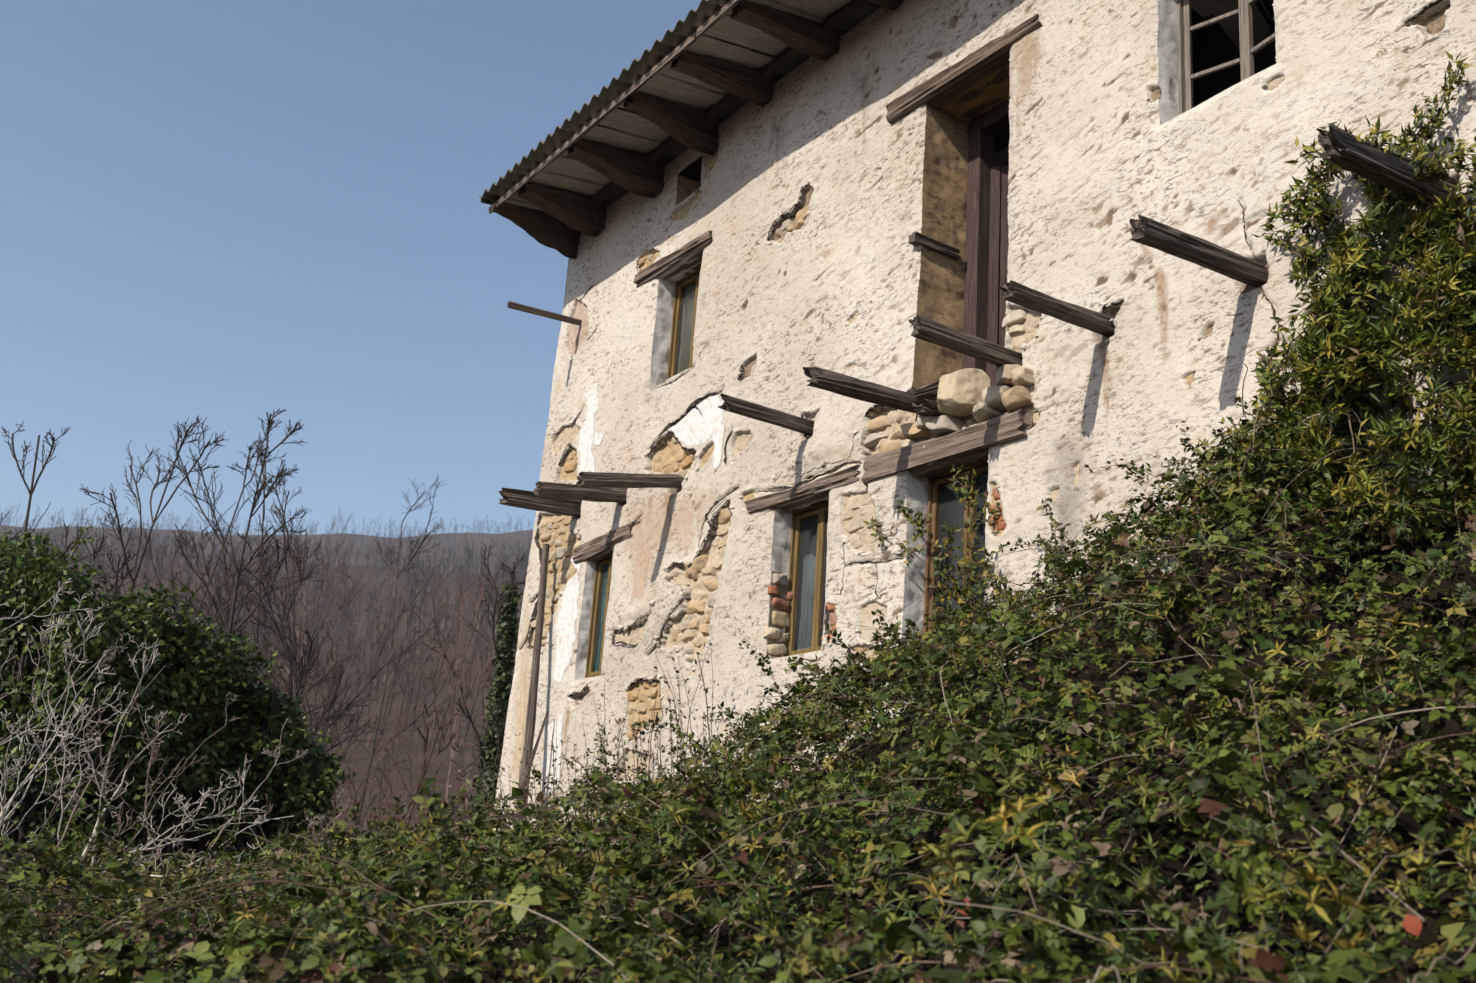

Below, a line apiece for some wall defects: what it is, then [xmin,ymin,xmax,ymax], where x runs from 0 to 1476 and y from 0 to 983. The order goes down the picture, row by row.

spalling [1402,0,1451,35]
flaking render [768,180,814,245]
flaking render [853,307,1042,455]
peeling [644,395,753,480]
flaking render [842,492,883,555]
flaking render [526,513,590,797]
flaking render [611,491,755,672]
flaking render [763,571,793,657]
flaking render [620,674,664,783]